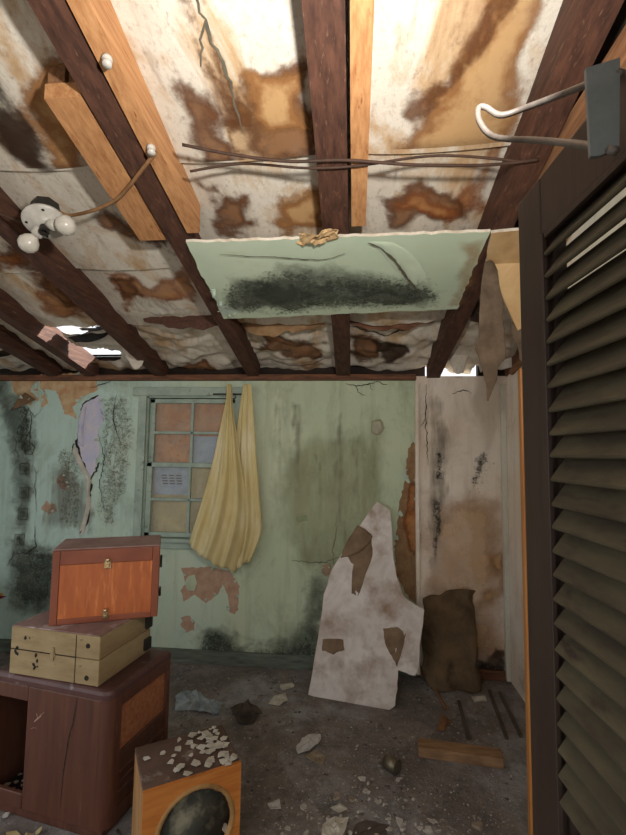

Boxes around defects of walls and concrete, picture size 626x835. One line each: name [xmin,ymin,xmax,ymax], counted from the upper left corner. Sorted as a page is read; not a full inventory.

water stain [0,56,84,173]
crack [196,0,243,132]
water stain [174,52,316,162]
water stain [402,0,541,157]
water stain [227,270,436,313]
peeling [11,372,103,478]
water stain [0,381,53,612]
peeling [394,439,420,603]
peeling [180,616,195,633]
peeling [181,566,240,614]